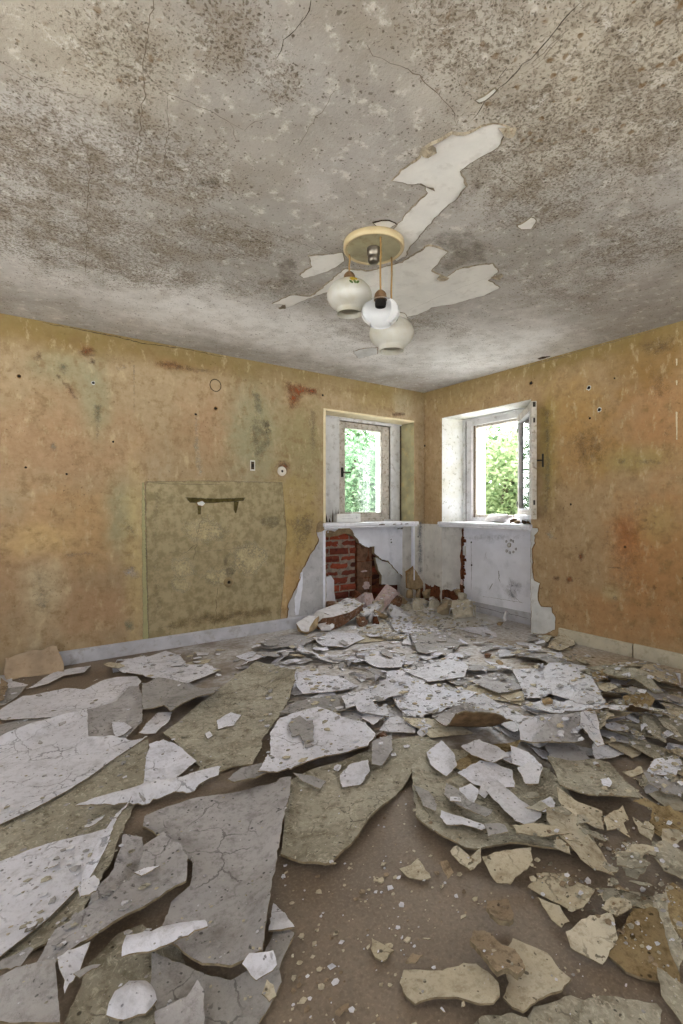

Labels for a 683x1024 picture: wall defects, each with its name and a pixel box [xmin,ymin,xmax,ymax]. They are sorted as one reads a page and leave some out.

crack [367,3,580,125]
peeling [474,87,498,104]
crack [78,133,98,271]
peeling [272,122,517,319]
peeling [516,217,537,230]
corrosion [288,383,315,408]
flaking render [287,521,354,618]
peeling [336,527,683,886]